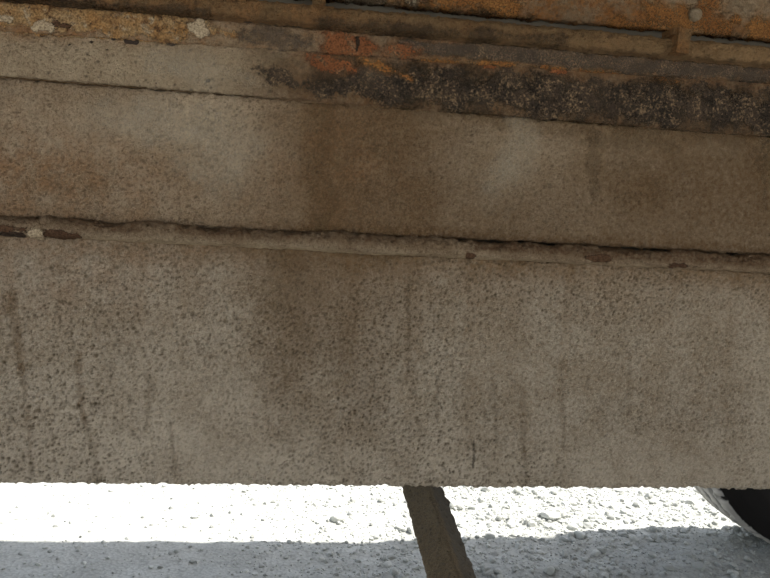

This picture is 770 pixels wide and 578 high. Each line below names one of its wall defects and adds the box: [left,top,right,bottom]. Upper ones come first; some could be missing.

corrosion [402,0,526,19]
corrosion [599,0,770,43]
corrosion [305,30,517,82]